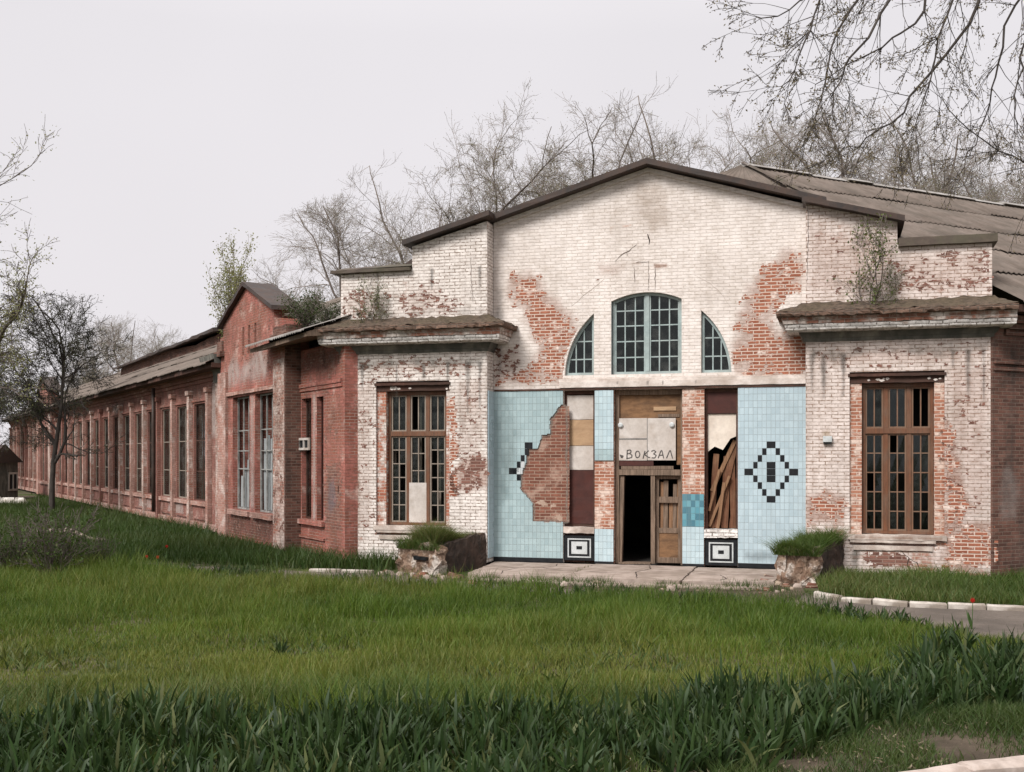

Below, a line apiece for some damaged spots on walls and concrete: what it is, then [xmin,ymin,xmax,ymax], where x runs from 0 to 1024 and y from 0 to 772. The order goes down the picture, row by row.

peeling [342,270,579,497]
peeling [731,249,998,571]